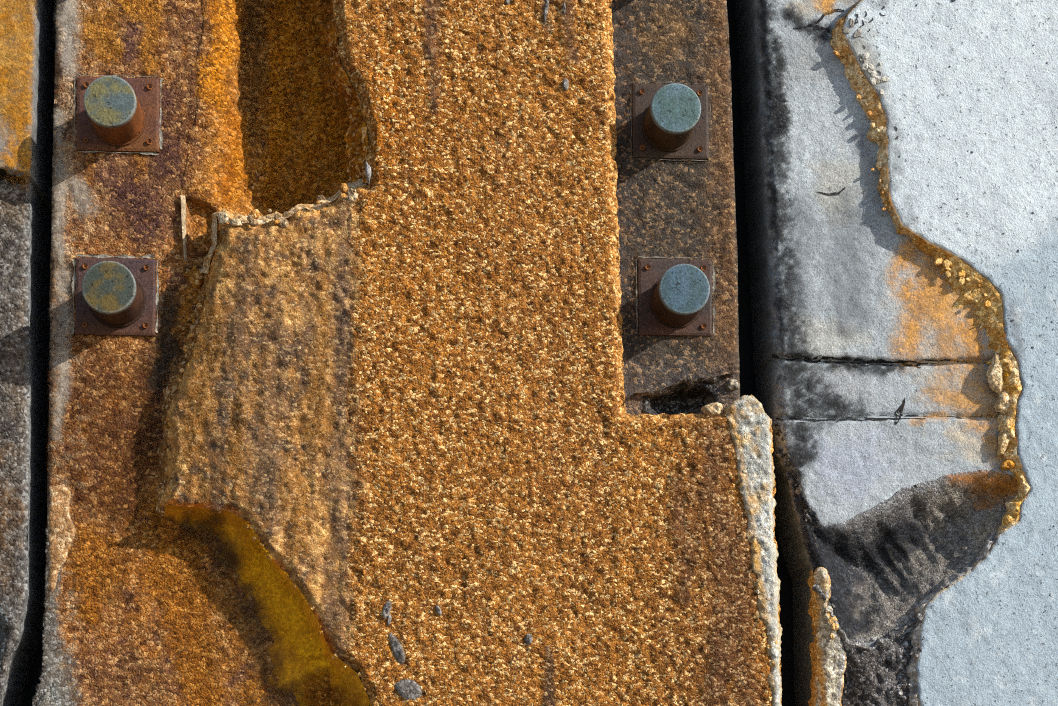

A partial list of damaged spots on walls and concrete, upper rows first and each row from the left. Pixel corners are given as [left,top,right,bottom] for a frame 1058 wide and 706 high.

rust [0,0,34,179]
rust [81,0,163,74]
rust [106,88,182,244]
rust [199,0,352,214]
spalling [153,0,372,706]
spalling [633,0,1030,706]
leakage [756,0,928,706]
crack [771,354,986,368]
crack [776,399,993,425]
rust [67,525,130,624]
rust [139,498,225,706]
rust [239,529,362,706]